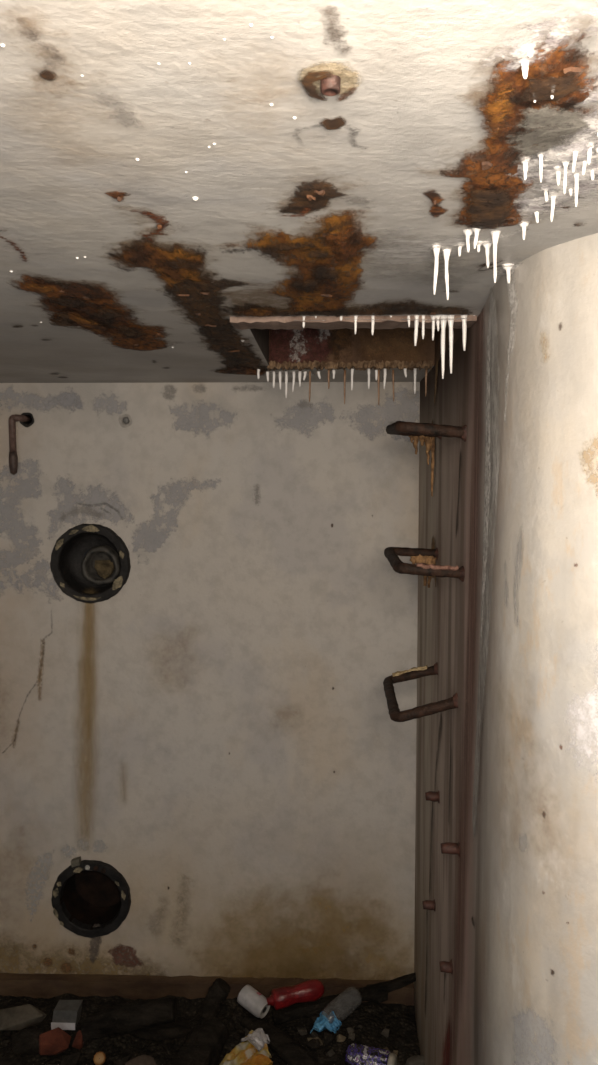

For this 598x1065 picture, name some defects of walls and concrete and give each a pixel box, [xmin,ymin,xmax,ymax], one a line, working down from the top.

spalling [299,62,359,101]
rust [424,33,598,229]
rust [105,191,130,202]
rust [109,179,482,376]
rust [13,275,168,369]
rust [408,435,435,497]
damp [379,92,598,835]
peeling [49,478,220,559]
rust [410,536,459,588]
crack [27,643,44,698]